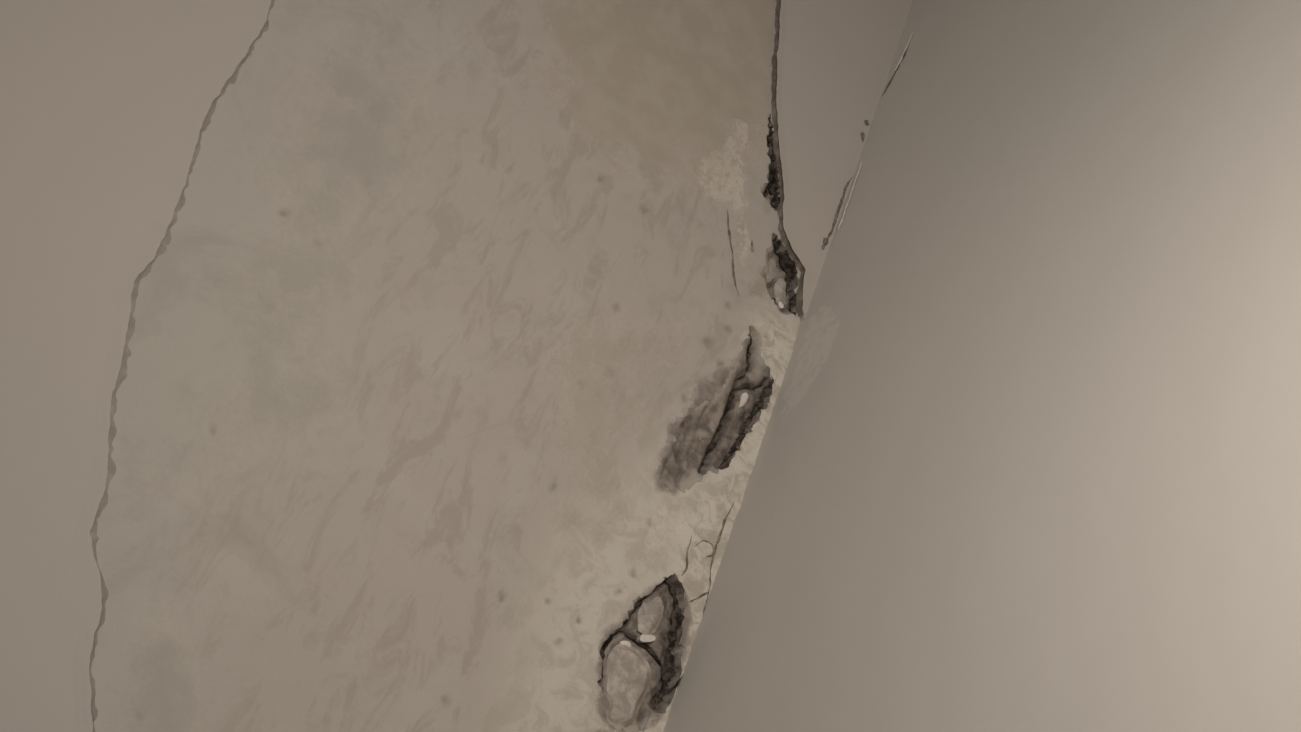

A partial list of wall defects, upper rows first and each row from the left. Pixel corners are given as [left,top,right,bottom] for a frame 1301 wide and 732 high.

flaking render [74,0,812,732]
crack [822,32,913,250]